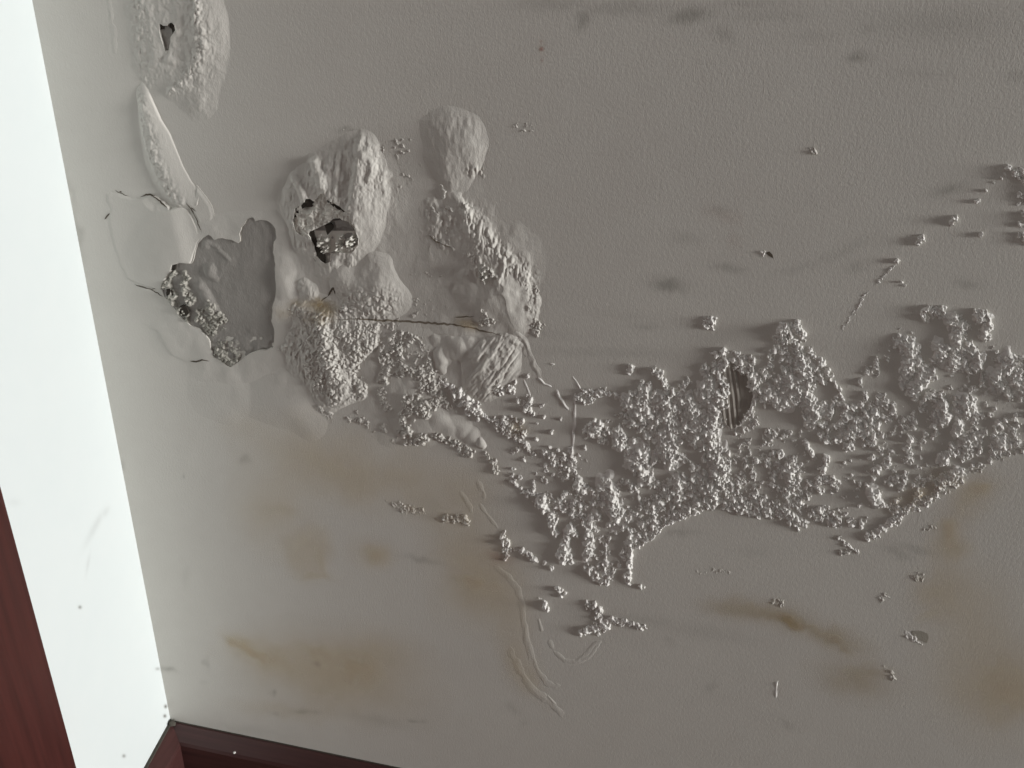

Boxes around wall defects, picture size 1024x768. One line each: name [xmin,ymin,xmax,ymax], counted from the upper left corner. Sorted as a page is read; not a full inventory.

spalling [106,185,306,384]
crack [321,287,506,337]
spalling [427,305,1024,590]
spalling [538,586,567,613]